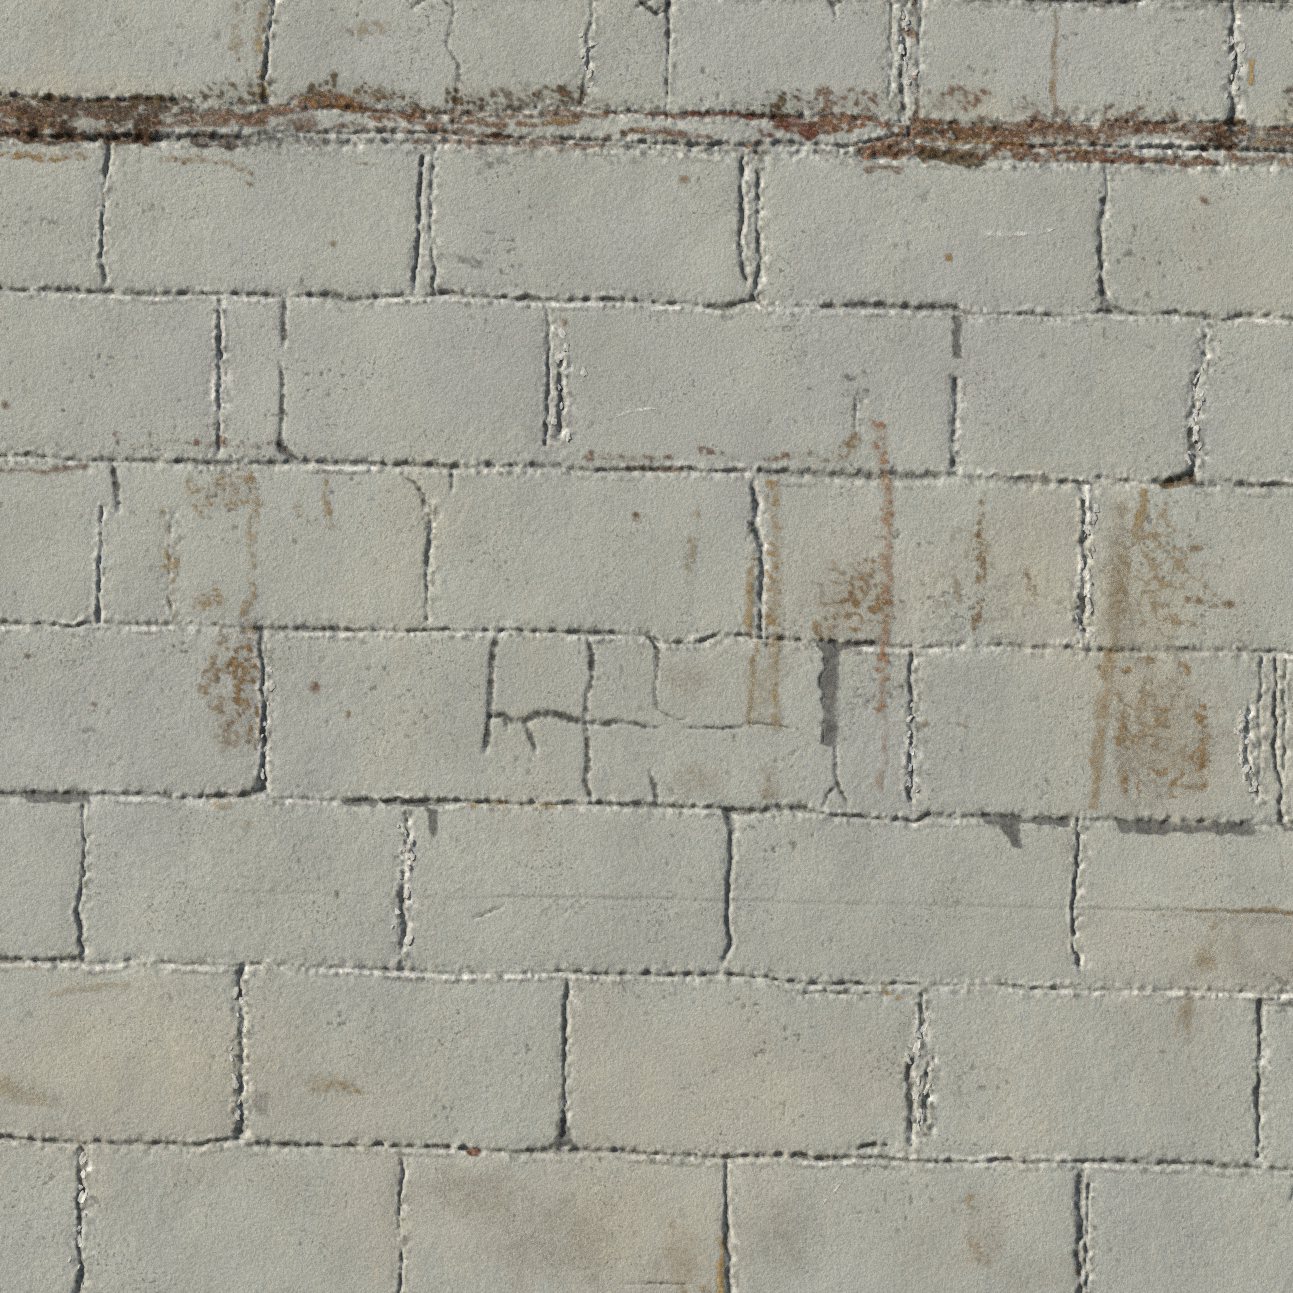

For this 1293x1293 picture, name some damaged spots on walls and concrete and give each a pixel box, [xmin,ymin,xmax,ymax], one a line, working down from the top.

corrosion [0,94,198,163]
corrosion [173,130,251,184]
corrosion [256,71,621,137]
corrosion [608,98,1293,173]
corrosion [744,524,781,663]
corrosion [812,420,893,711]
corrosion [1111,489,1157,613]
corrosion [199,583,259,749]
crack [484,639,659,796]
crack [825,762,845,798]
corrosion [1090,685,1210,798]